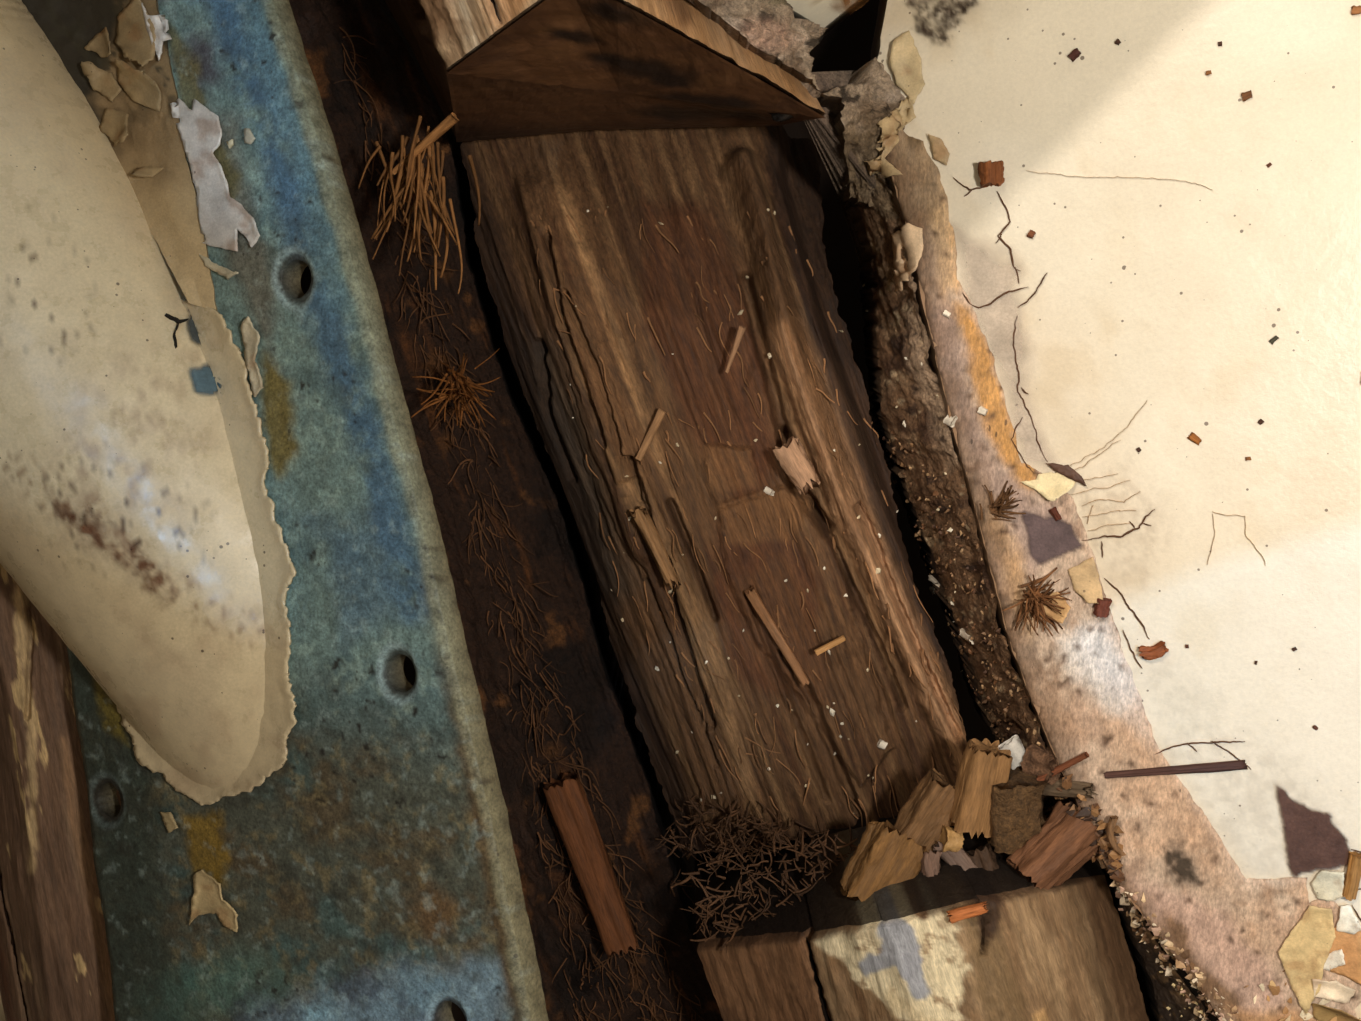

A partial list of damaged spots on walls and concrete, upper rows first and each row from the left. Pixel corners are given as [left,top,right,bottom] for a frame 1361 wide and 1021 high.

mould [909,0,976,41]
crack [953,177,1155,668]
peeling [835,30,1361,1021]
crack [1207,511,1266,566]